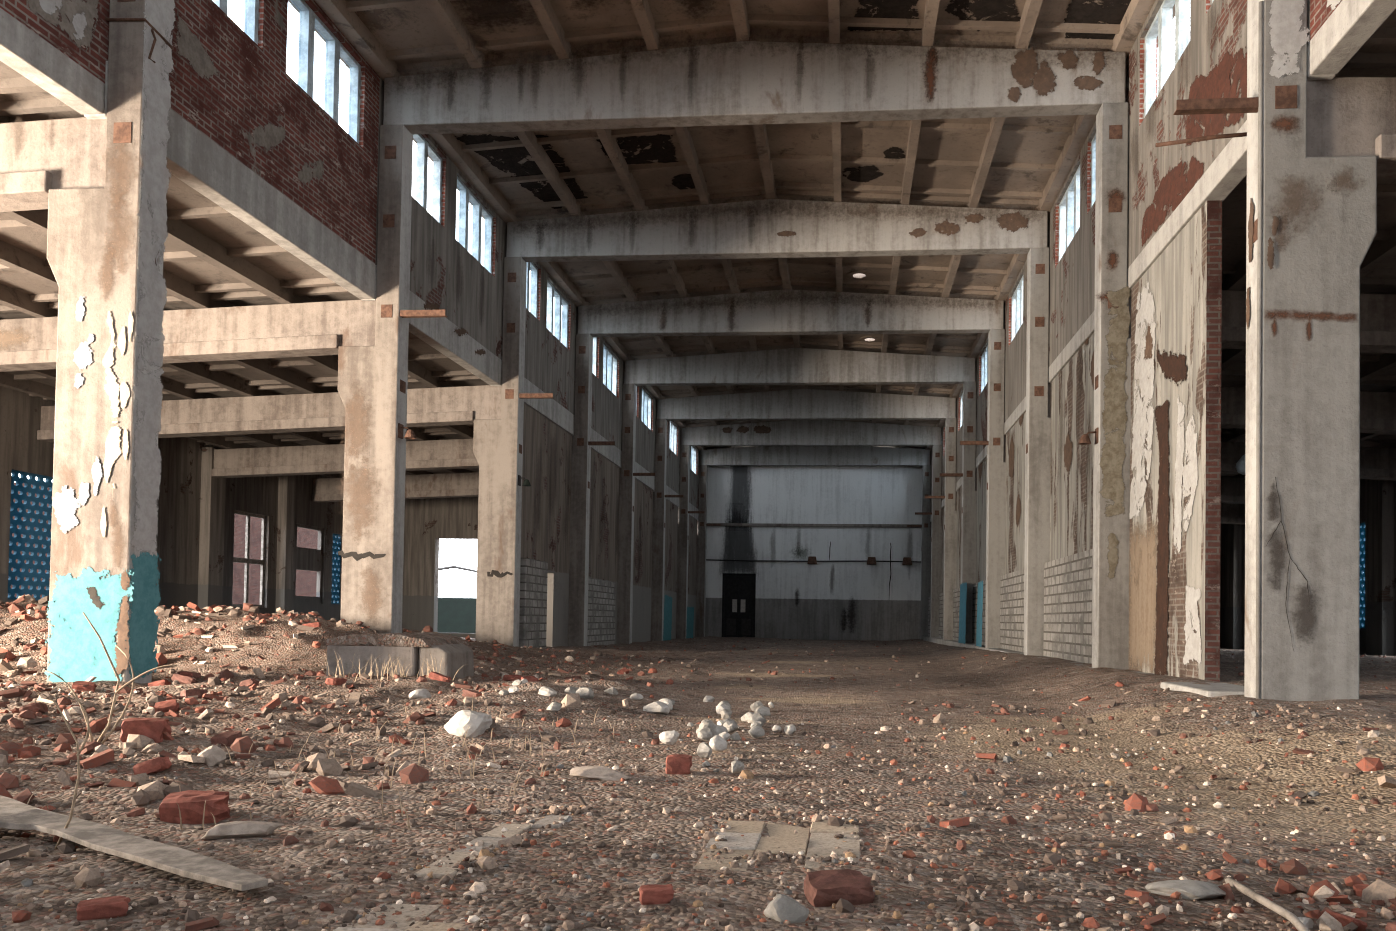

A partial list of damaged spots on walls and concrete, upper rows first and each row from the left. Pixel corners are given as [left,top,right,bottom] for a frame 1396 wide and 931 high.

flaking render [28,0,99,51]
spalling [1007,0,1131,103]
peeling [1268,0,1310,79]
flaking render [252,122,286,151]
flaking render [1141,46,1247,246]
peeling [44,0,219,682]
flaking render [1064,434,1073,471]
peeling [1084,279,1202,676]
damp [1268,484,1284,589]
damp [1294,587,1316,640]